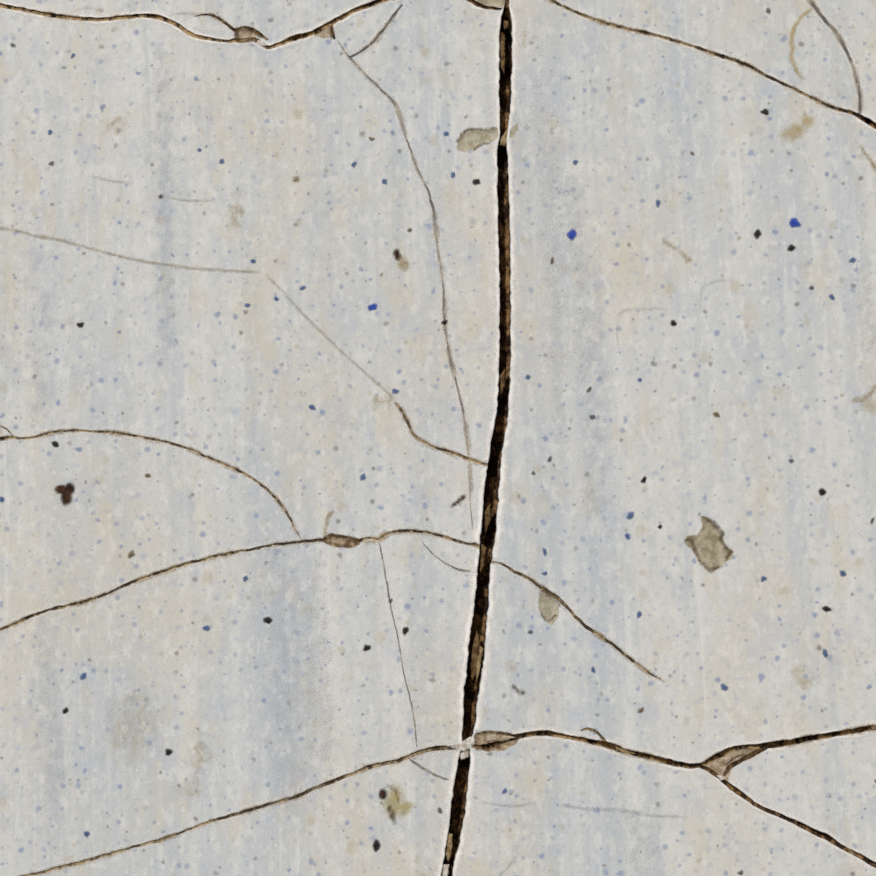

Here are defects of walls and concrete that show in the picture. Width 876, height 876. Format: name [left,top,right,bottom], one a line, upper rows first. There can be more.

spalling [466,0,505,11]
crack [0,0,447,320]
spalling [457,124,518,152]
crack [357,0,876,876]
crack [0,425,326,631]
spalling [684,516,734,571]
crack [21,745,457,876]